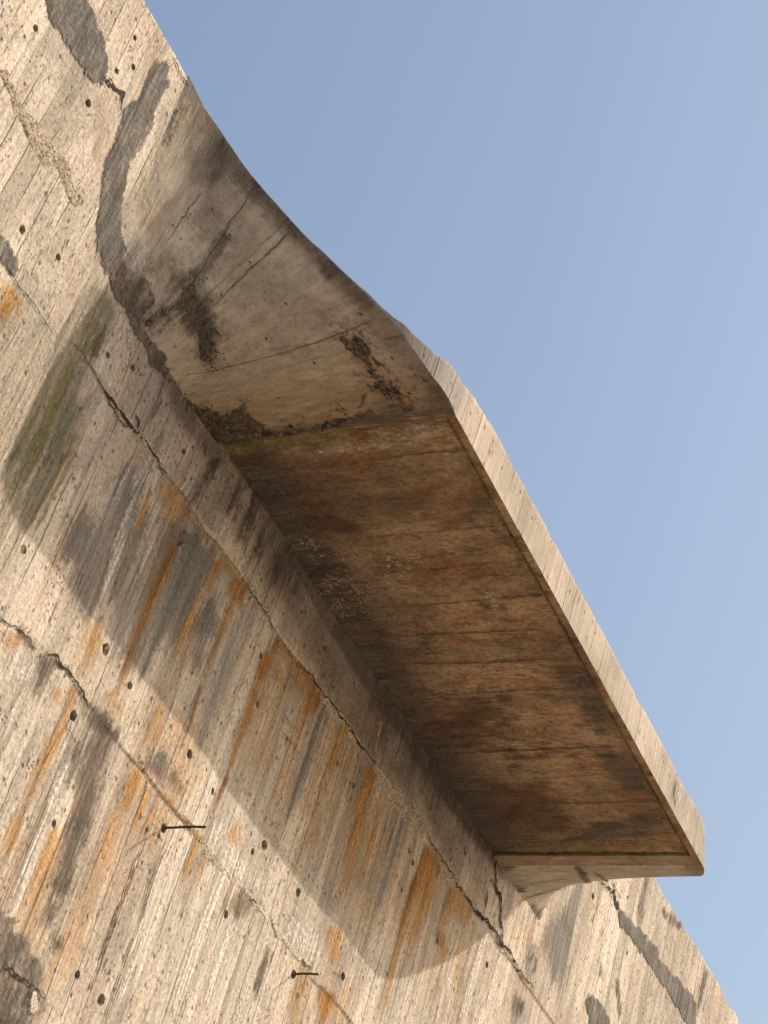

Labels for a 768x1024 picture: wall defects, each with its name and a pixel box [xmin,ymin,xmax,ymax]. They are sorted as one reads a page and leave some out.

damp [139,233,230,362]
damp [0,312,88,573]
crack [0,268,377,764]
corrosion [134,479,249,648]
crack [219,413,446,444]
corrosion [217,637,321,803]
damp [194,456,683,853]
crack [89,825,166,1020]
corrosion [318,989,336,1021]
damp [346,766,431,917]
corrosion [384,846,473,999]
crack [428,837,536,990]